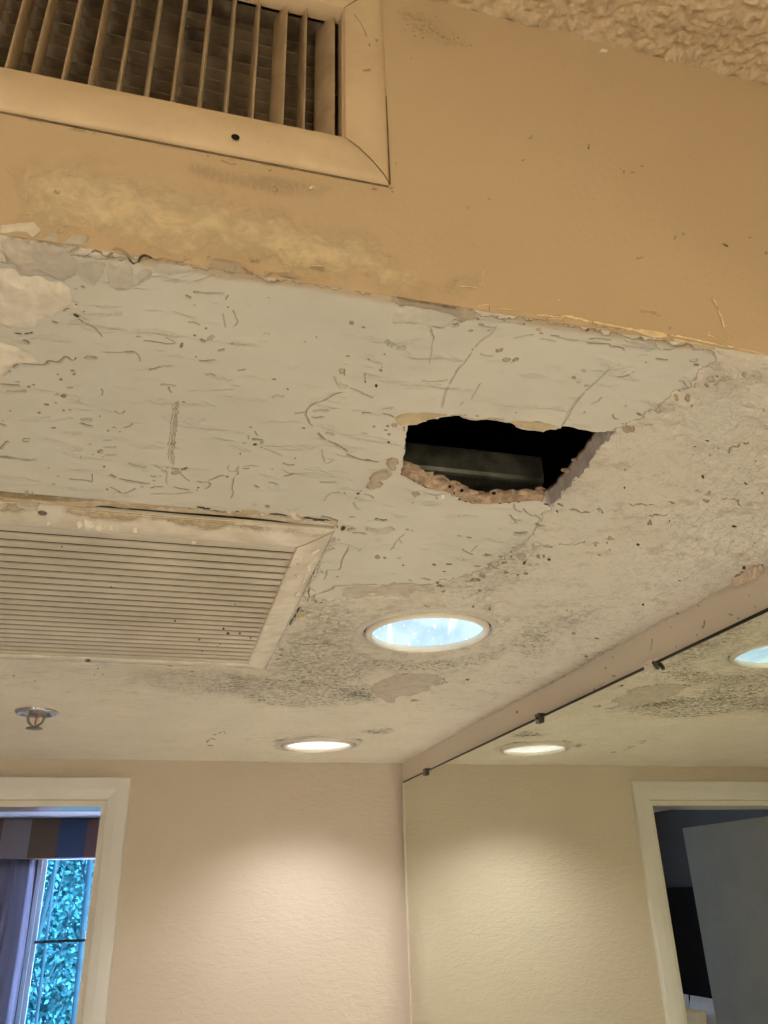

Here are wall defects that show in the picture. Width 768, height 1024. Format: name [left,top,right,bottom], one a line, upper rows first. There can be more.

crack [0,286,378,525]
peeling [0,222,729,625]
crack [423,326,496,408]
crack [557,329,700,426]
crack [509,503,590,546]
peeling [370,673,448,703]